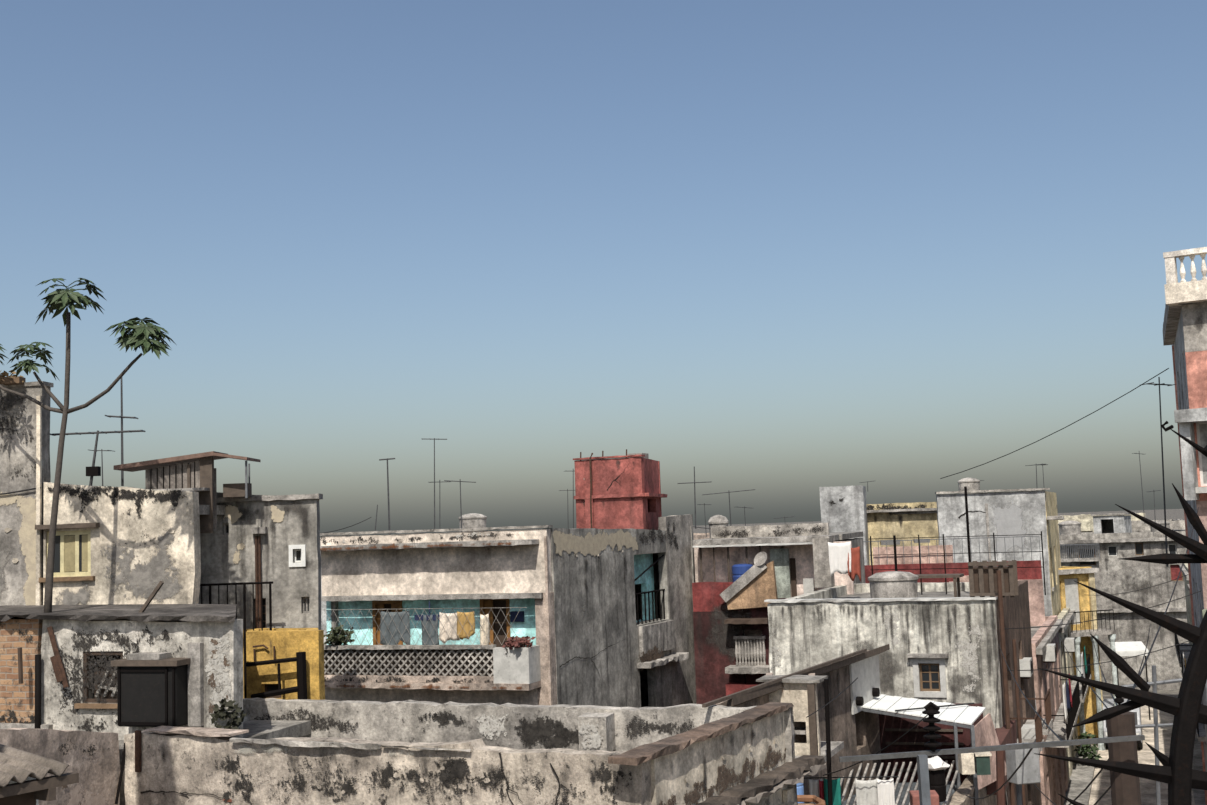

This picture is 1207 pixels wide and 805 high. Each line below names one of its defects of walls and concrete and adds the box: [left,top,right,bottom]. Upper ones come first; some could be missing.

peeling [0,492,36,605]
damp [418,707,467,732]
damp [514,715,586,753]
damp [625,711,694,740]
damp [214,748,558,805]
crack [499,752,522,805]
crack [550,763,571,805]
damp [587,761,632,805]